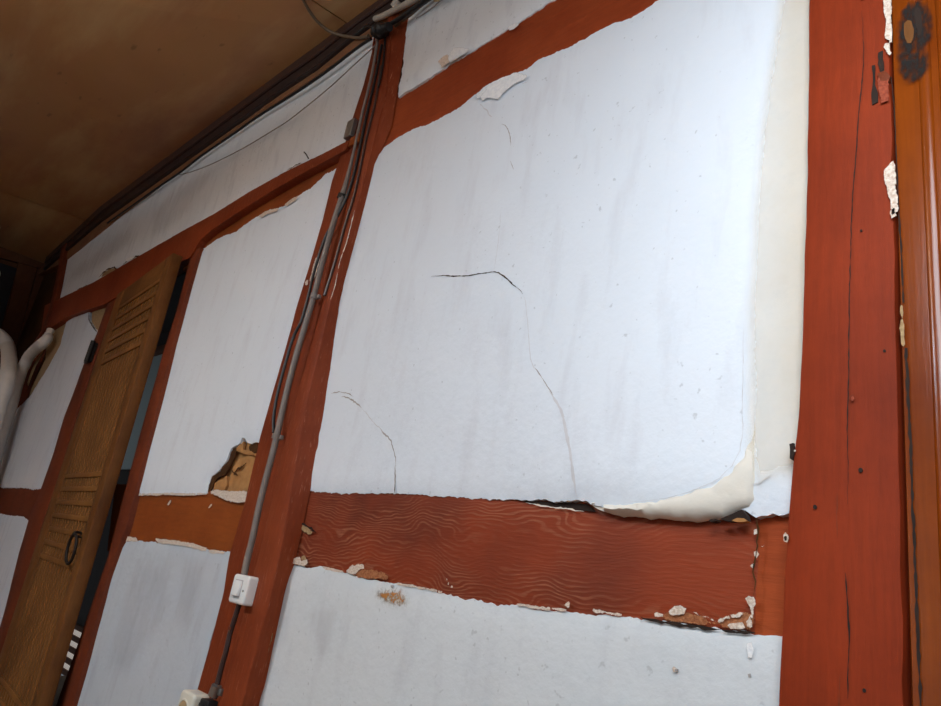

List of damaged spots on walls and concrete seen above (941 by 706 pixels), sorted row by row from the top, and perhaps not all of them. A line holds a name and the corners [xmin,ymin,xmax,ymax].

spalling [476,72,528,117]
spalling [871,50,891,105]
crack [441,215,577,496]
crack [331,391,396,492]
spalling [139,442,259,503]
spalling [293,555,308,566]
spalling [347,564,388,580]
spalling [641,596,756,658]